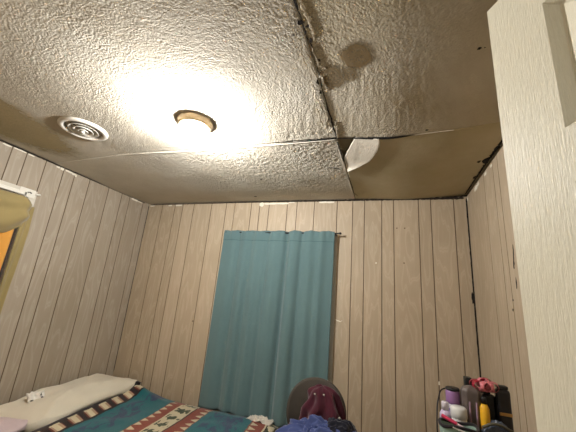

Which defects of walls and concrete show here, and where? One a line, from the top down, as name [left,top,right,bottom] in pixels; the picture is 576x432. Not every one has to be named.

water stain [322,43,373,88]
peeling [344,137,379,172]